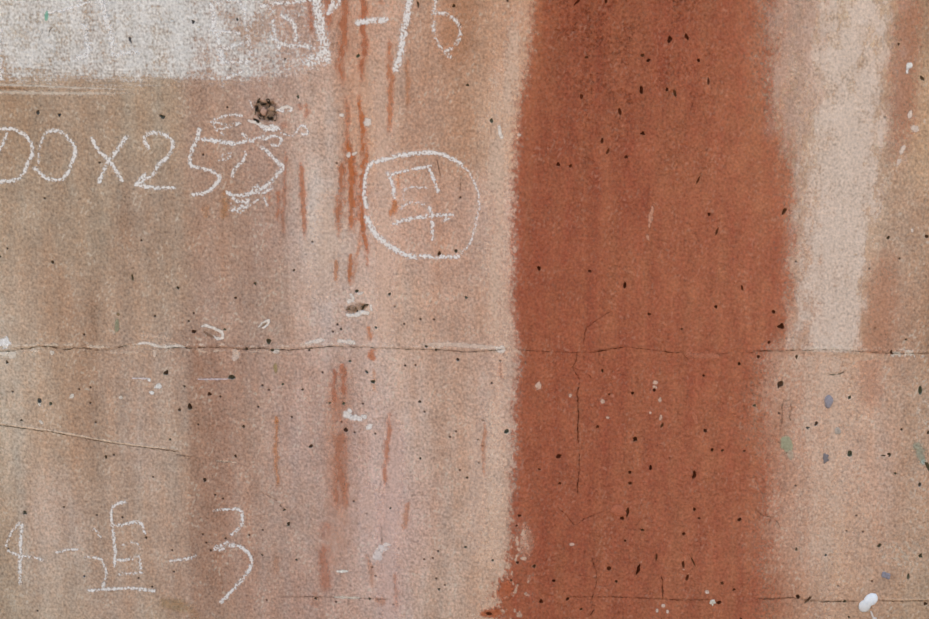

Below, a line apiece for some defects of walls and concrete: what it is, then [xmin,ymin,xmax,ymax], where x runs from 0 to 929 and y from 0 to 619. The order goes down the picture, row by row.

corrosion [325,0,348,79]
corrosion [359,0,368,78]
corrosion [386,46,394,125]
corrosion [334,100,368,251]
corrosion [334,254,353,282]
corrosion [480,0,797,619]
corrosion [332,364,347,409]
crack [524,313,690,494]
corrosion [383,425,392,482]